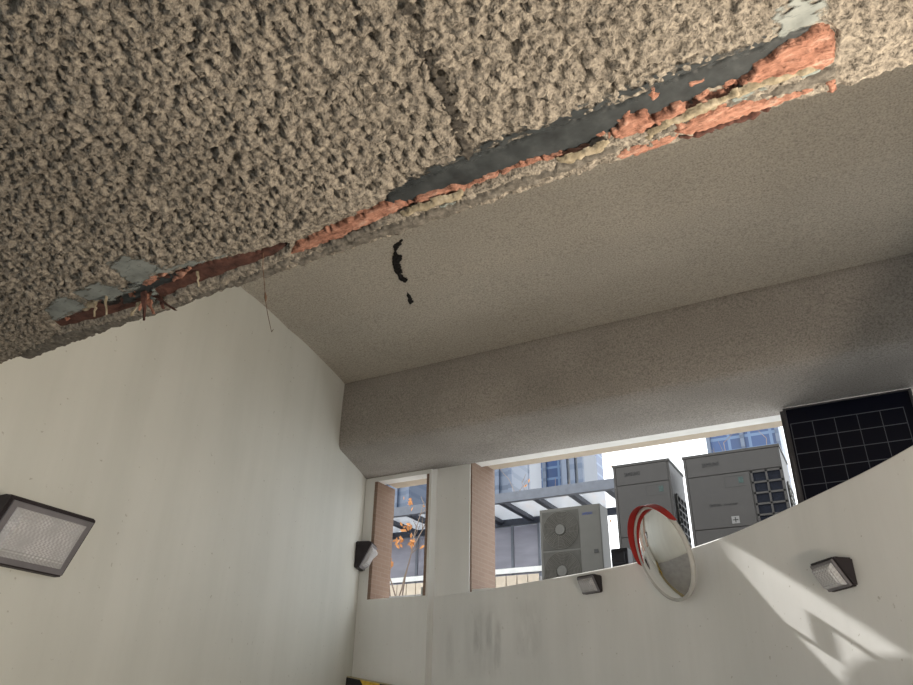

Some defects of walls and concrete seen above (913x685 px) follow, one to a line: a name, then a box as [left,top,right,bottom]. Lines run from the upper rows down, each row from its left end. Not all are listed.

crack [401,2,474,161]
spalling [19,0,837,359]
crack [392,234,414,305]